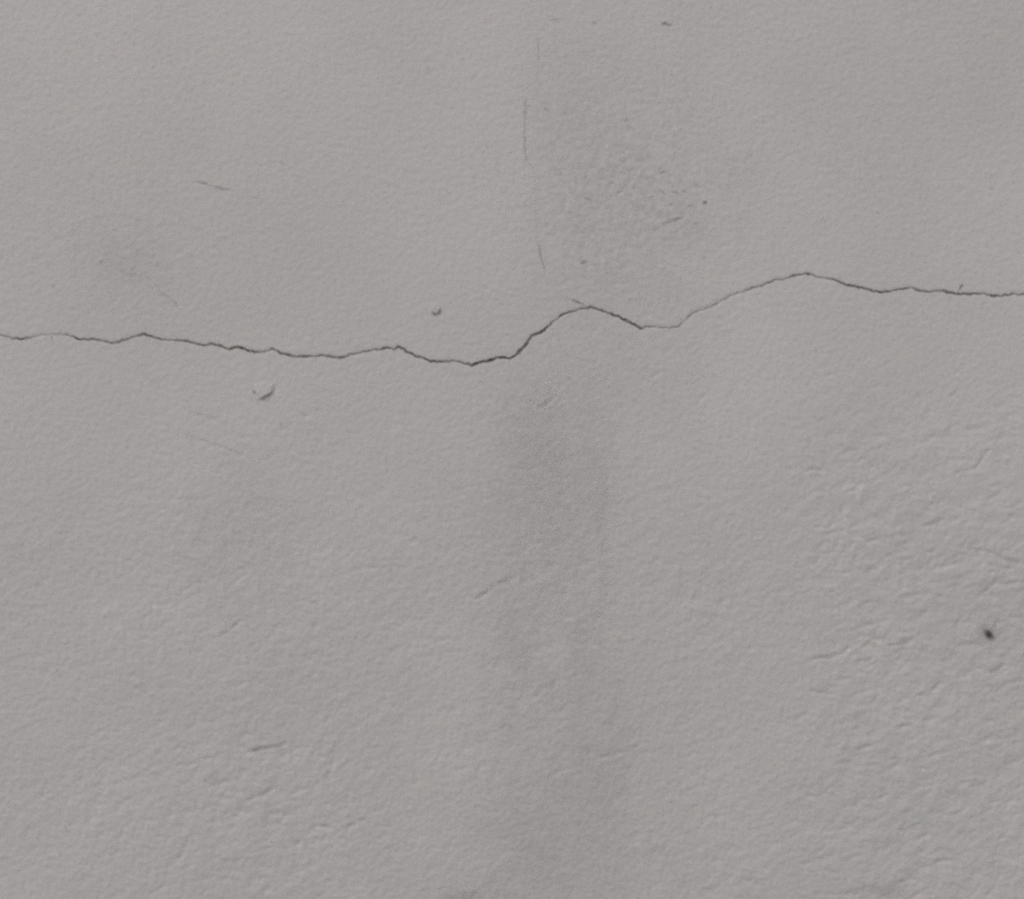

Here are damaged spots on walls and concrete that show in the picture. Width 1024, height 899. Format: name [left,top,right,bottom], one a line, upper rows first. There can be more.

crack [836,280,1008,297]
crack [376,306,641,366]
crack [199,343,308,357]